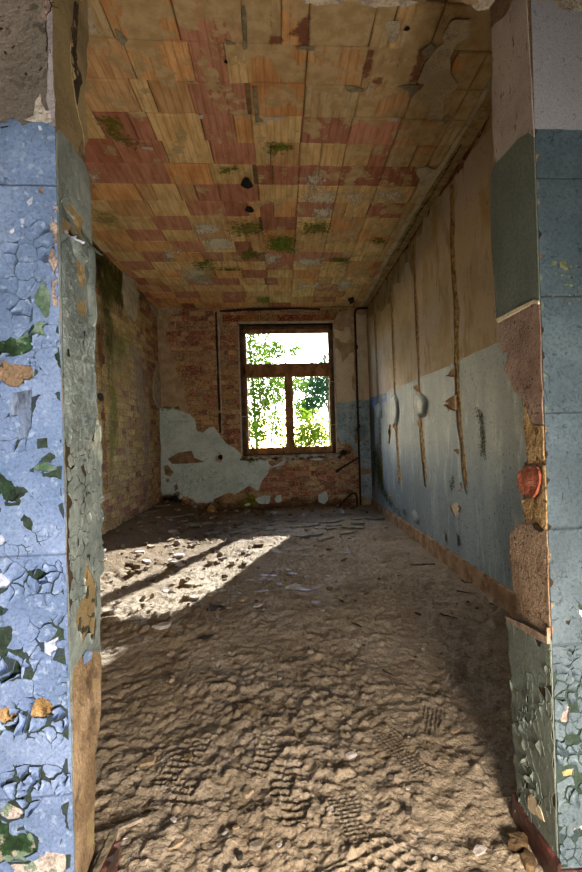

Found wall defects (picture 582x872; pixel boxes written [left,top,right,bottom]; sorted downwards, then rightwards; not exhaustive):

peeling [417,19,470,121]
flaking render [0,206,103,392]
peeling [334,75,493,498]
peeling [0,474,19,503]
crack [0,220,105,872]
flaking render [164,451,203,501]
flaking render [495,300,554,644]
flaking render [0,566,102,872]
crack [506,620,582,868]